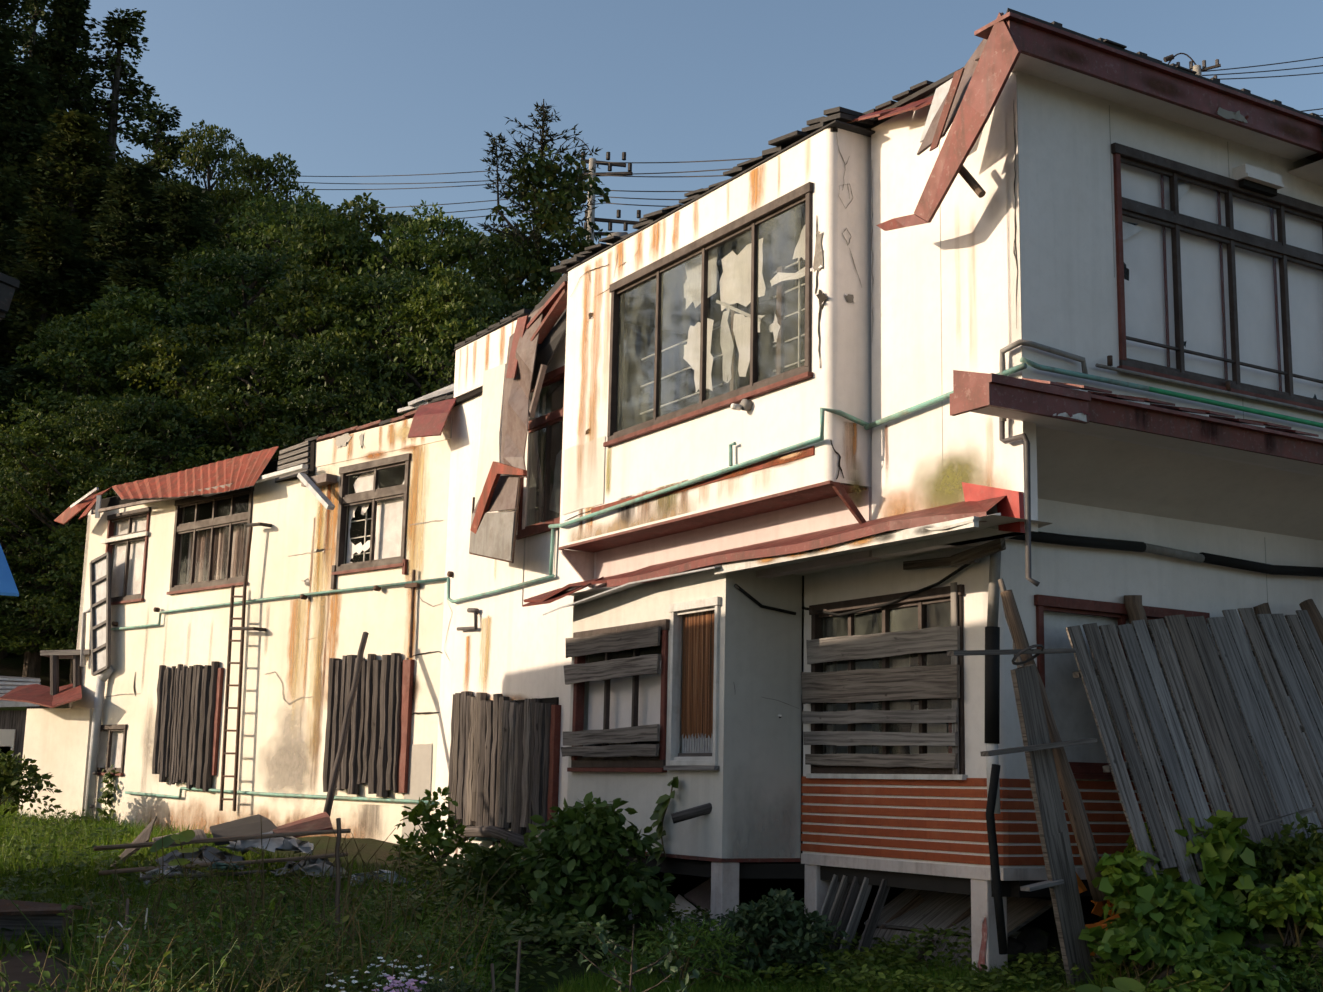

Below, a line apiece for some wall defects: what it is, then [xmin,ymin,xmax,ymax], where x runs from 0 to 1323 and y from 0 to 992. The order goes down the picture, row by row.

corrosion [578,260,600,433]
corrosion [616,212,678,271]
corrosion [750,166,763,206]
crack [815,270,828,368]
crack [816,134,873,336]
corrosion [366,420,425,659]
corrosion [289,482,339,772]
water stain [266,714,306,791]